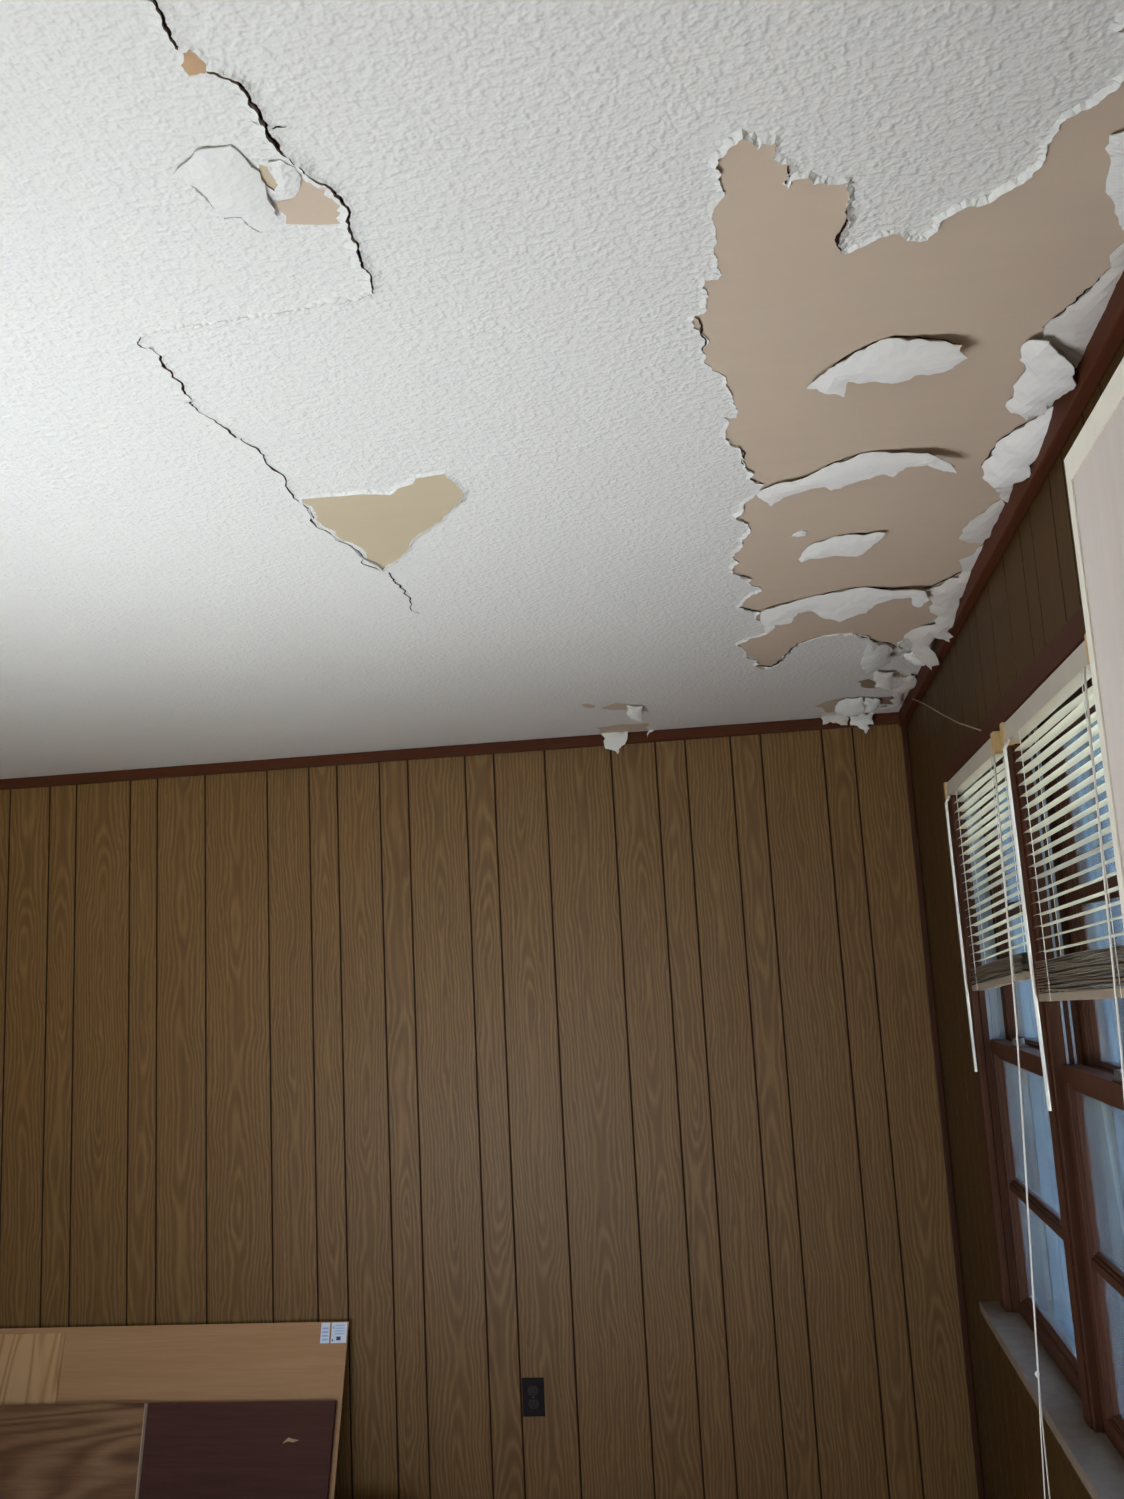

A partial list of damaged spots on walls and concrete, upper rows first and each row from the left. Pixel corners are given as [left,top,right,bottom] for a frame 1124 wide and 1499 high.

spalling [174,42,210,78]
peeling [1108,10,1124,43]
peeling [173,145,340,233]
crack [126,0,418,613]
peeling [685,73,1124,733]
peeling [298,471,470,572]
peeling [581,703,654,754]